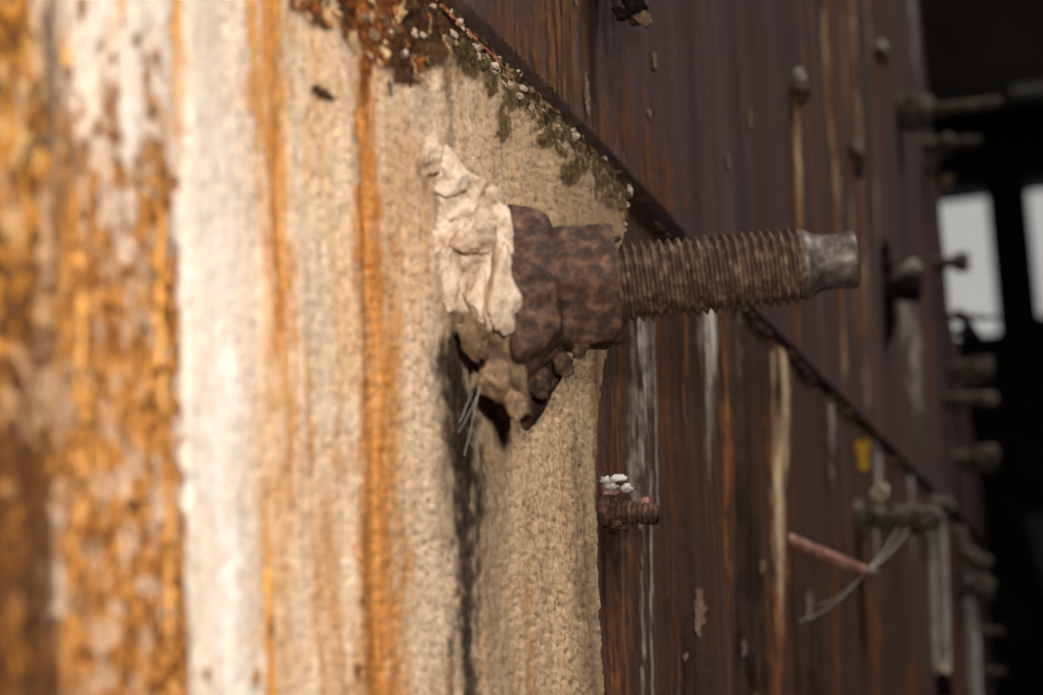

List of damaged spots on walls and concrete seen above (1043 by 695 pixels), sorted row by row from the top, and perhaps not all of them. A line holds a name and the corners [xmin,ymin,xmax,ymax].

rust [0,0,190,695]
rust [252,509,278,695]
rust [247,0,314,488]
rust [352,79,406,695]
water stain [438,330,482,695]
spalling [288,0,633,233]
rust [516,0,584,105]
water stain [637,317,656,415]
water stain [640,524,653,664]
water stain [701,309,733,580]
rust [767,336,789,695]
rust [793,98,804,229]